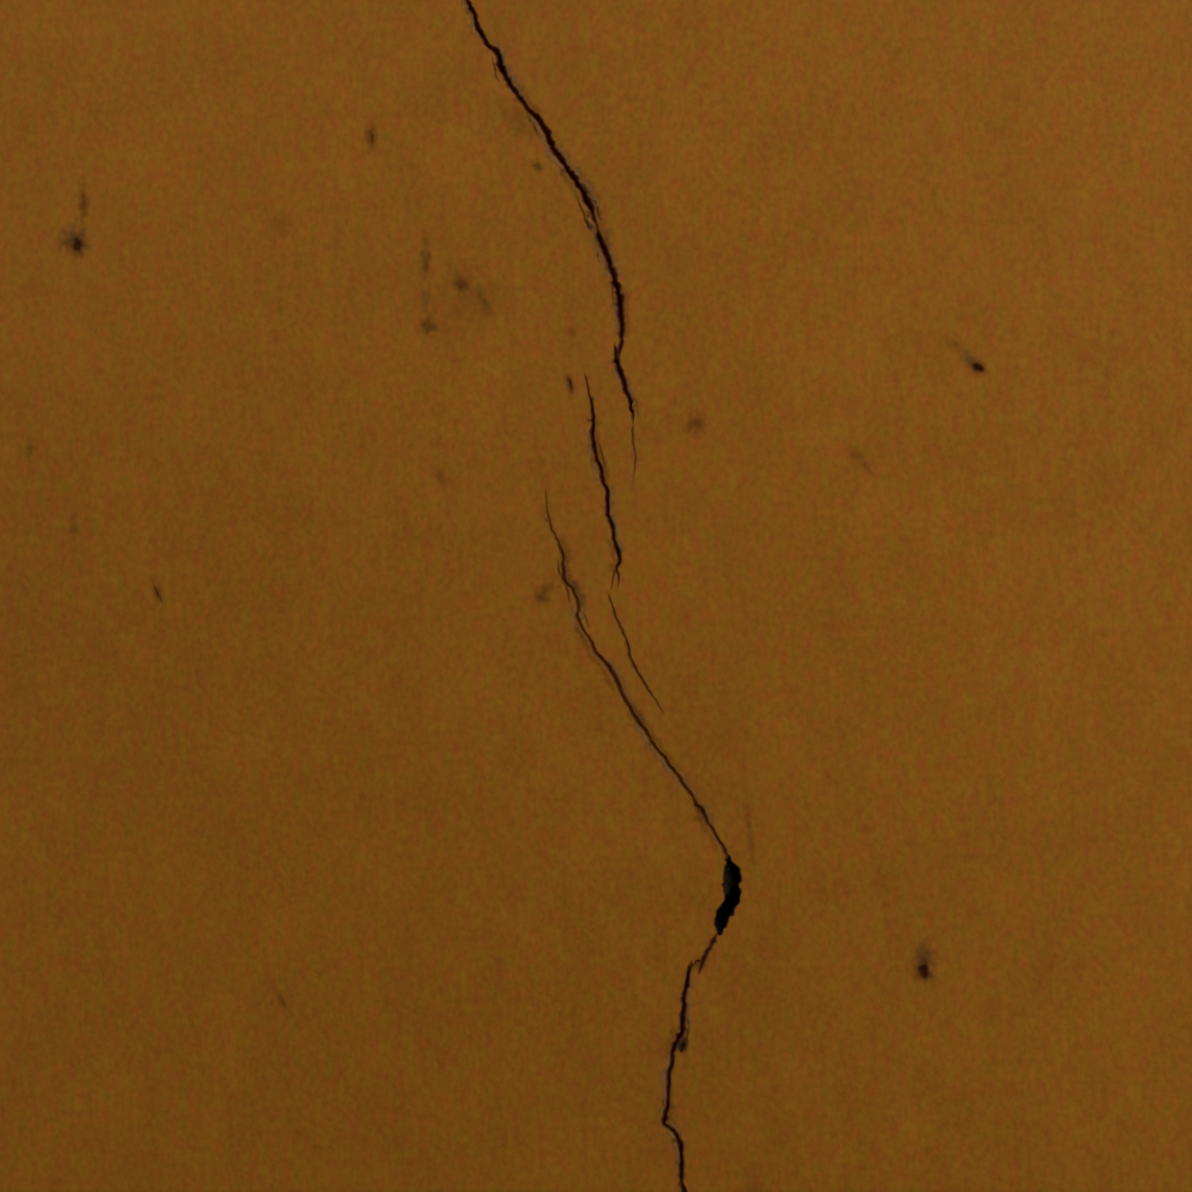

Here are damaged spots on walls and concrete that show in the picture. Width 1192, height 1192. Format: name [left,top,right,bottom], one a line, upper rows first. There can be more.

crack [461,0,727,859]
crack [660,932,718,1192]